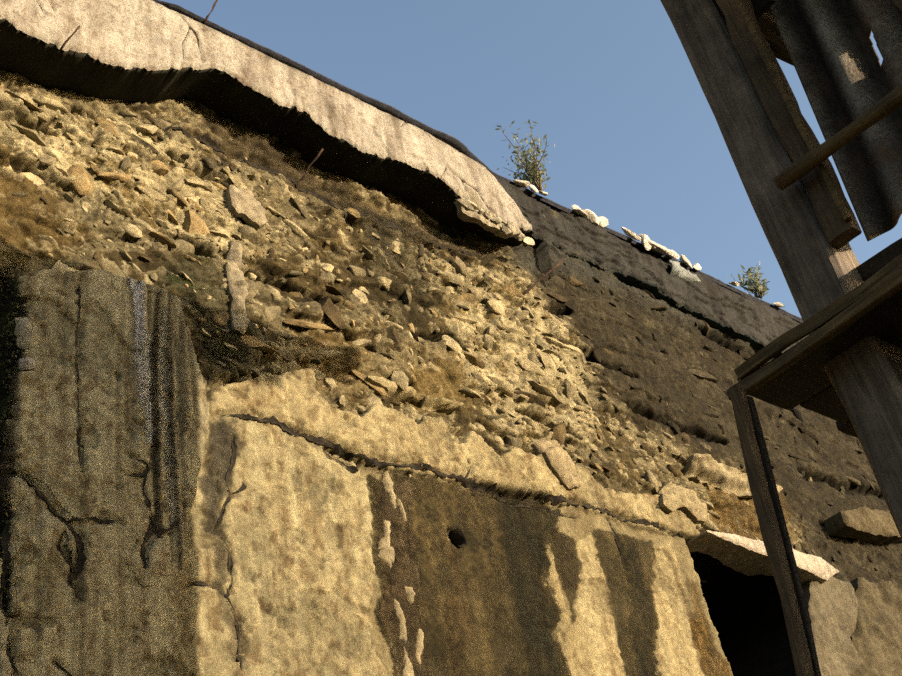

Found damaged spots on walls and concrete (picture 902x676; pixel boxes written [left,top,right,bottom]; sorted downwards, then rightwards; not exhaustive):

crack [74,274,82,465]
spalling [0,70,763,541]
crack [0,520,19,675]
crack [2,475,122,601]
crack [127,458,179,568]
crack [187,413,683,667]
damp [367,473,582,676]
spalling [690,551,785,648]
spalling [747,395,902,590]